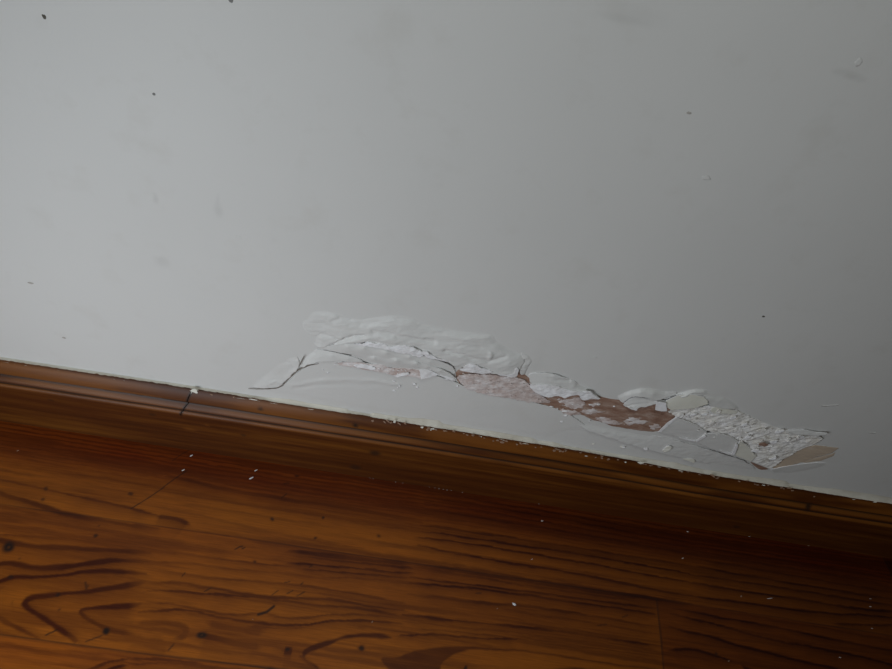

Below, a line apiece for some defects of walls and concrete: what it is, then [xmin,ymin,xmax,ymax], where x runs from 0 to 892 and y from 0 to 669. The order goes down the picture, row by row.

peeling [456,370,838,473]